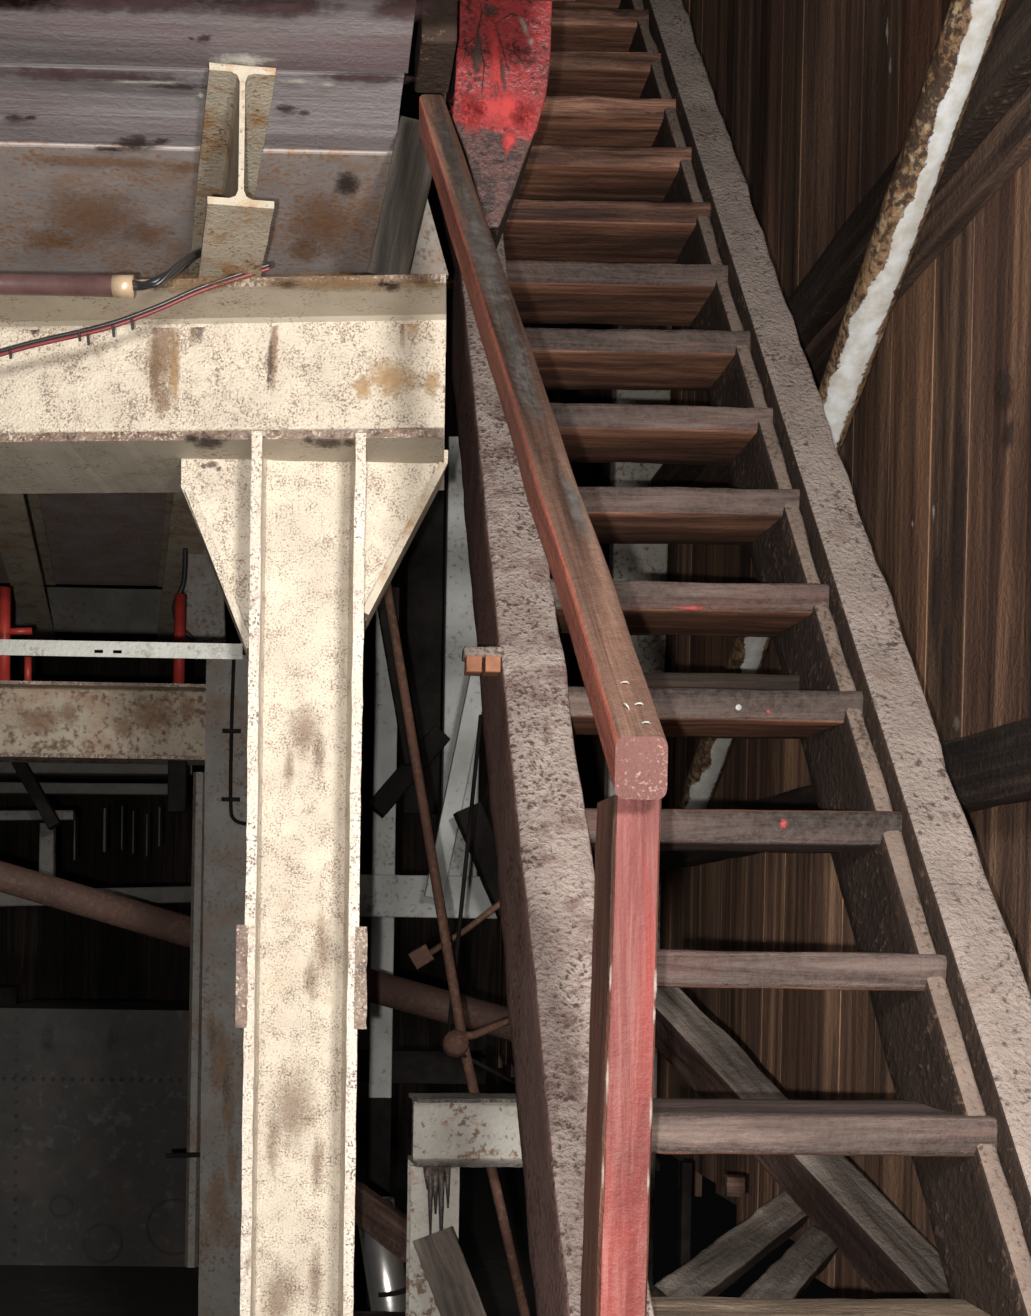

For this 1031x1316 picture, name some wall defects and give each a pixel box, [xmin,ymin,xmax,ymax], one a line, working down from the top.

damp [0,0,40,10]
damp [208,0,319,17]
damp [375,0,430,17]
damp [5,67,205,90]
damp [323,73,400,83]
damp [277,105,309,115]
damp [97,135,168,151]
rust [150,328,179,410]
rust [355,366,439,395]